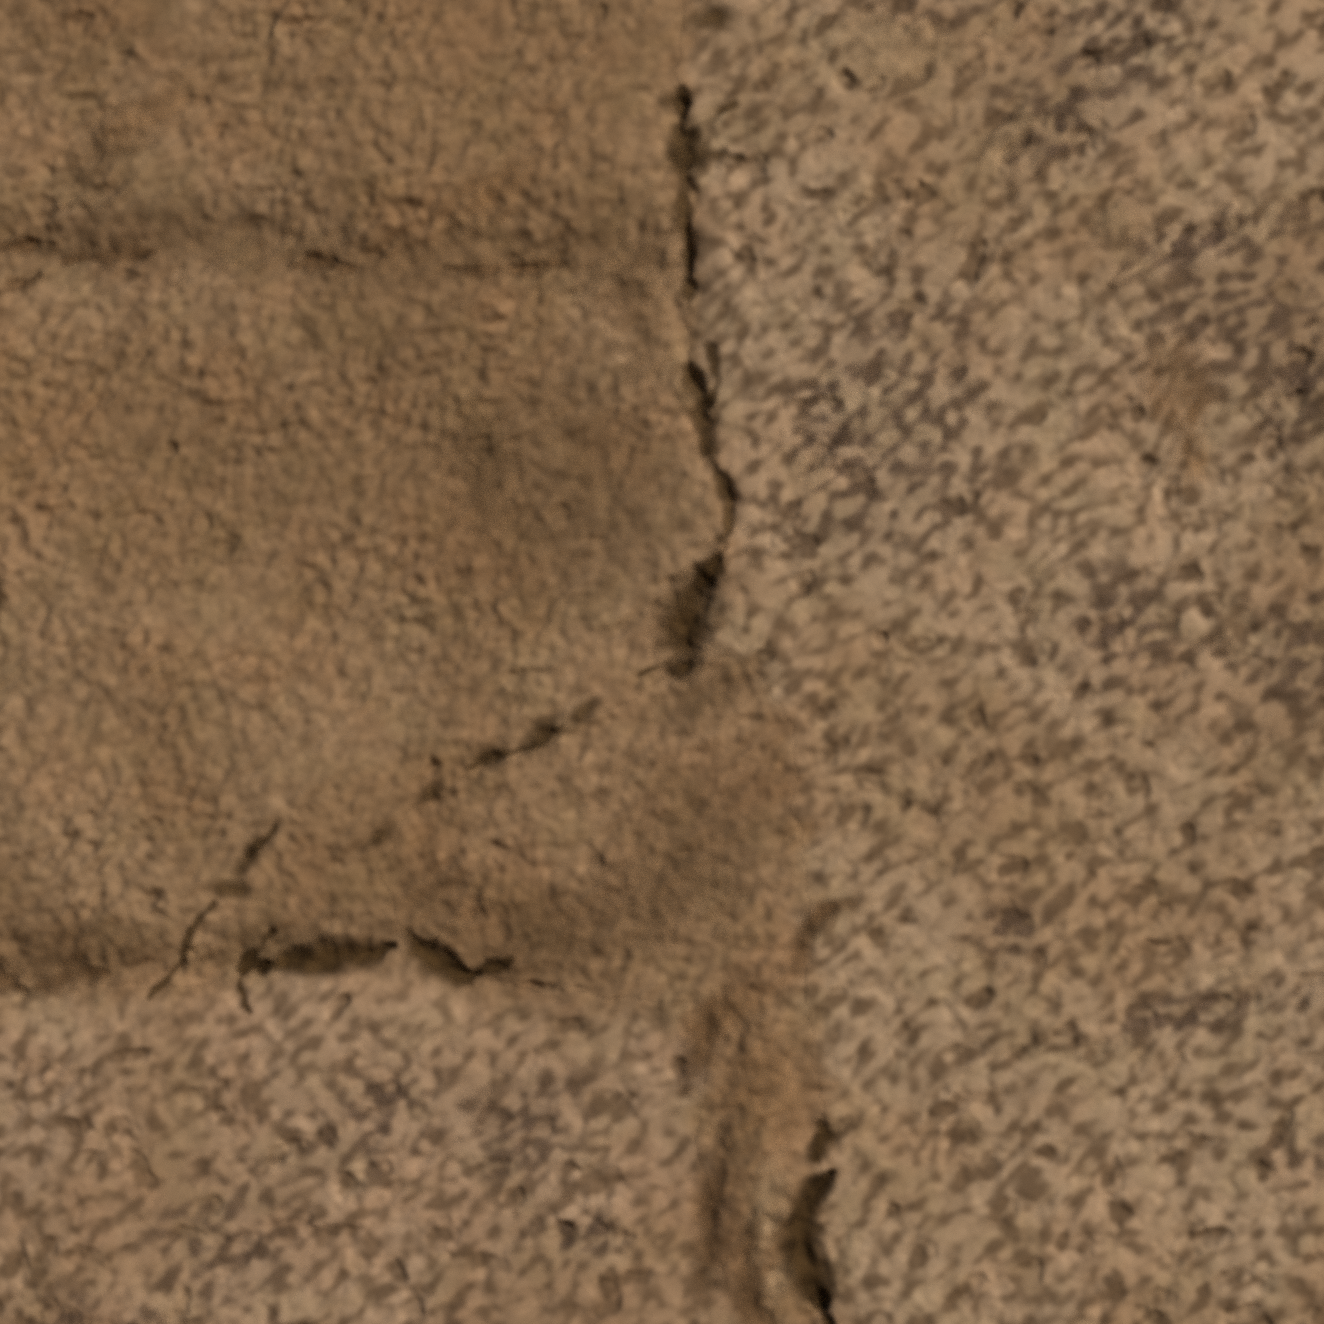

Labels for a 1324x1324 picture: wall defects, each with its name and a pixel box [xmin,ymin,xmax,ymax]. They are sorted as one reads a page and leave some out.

crack [701,8,727,25]
crack [667,86,742,299]
crack [684,342,734,584]
crack [639,655,676,676]
crack [468,701,595,769]
crack [423,786,439,799]
crack [372,831,387,844]
crack [238,929,513,1013]
crack [781,1119,836,1324]